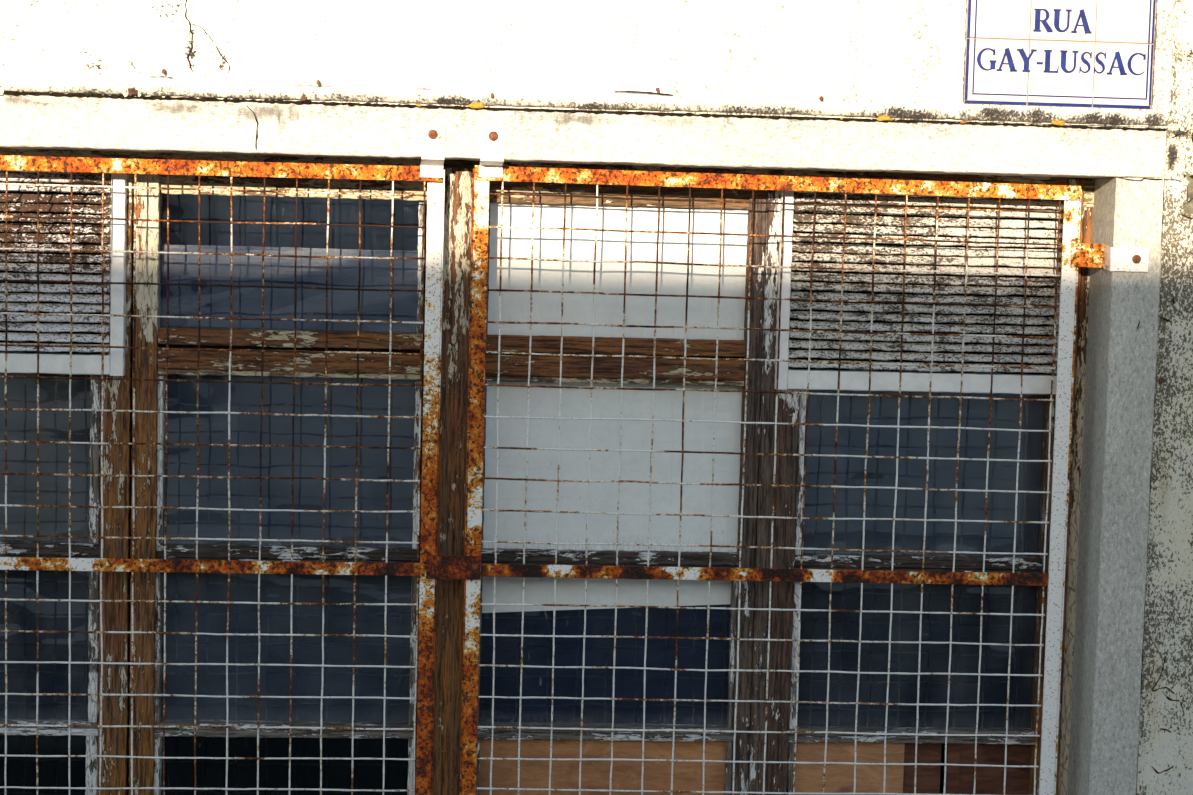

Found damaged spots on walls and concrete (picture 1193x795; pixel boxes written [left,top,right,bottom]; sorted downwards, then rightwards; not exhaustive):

crack [3,0,1193,150]
crack [1118,177,1193,203]
spalling [1178,171,1193,220]